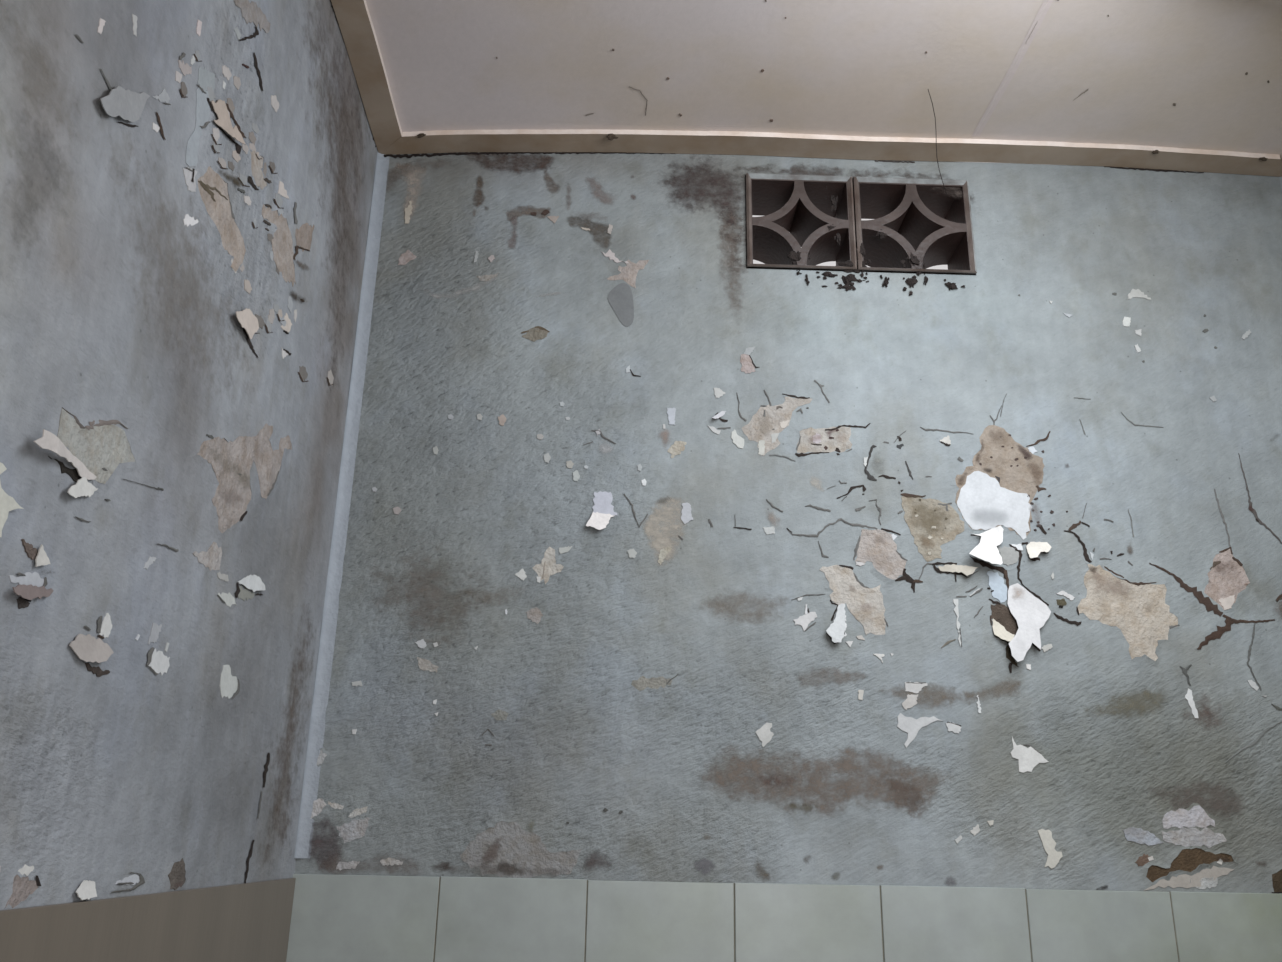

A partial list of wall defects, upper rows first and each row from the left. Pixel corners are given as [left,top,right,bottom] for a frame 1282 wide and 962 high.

water stain [470,154,552,172]
peeling [100,50,315,382]
water stain [507,207,610,247]
crack [708,394,1007,558]
peeling [9,539,54,609]
crack [895,563,933,592]
peeling [793,421,1053,673]
crack [1009,544,1082,626]
peeling [1072,559,1184,668]
crack [1064,503,1282,763]
water stain [707,749,938,812]
flaking render [1135,845,1240,892]